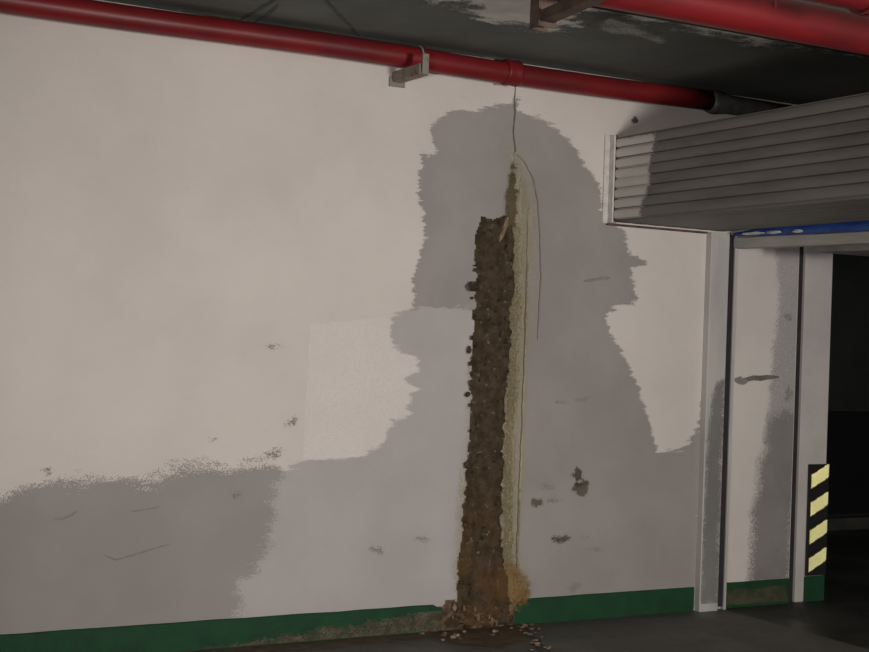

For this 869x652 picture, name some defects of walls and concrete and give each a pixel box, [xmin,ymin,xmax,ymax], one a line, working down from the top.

crack [511,87,542,339]
water stain [0,96,725,634]
peeling [572,466,590,497]